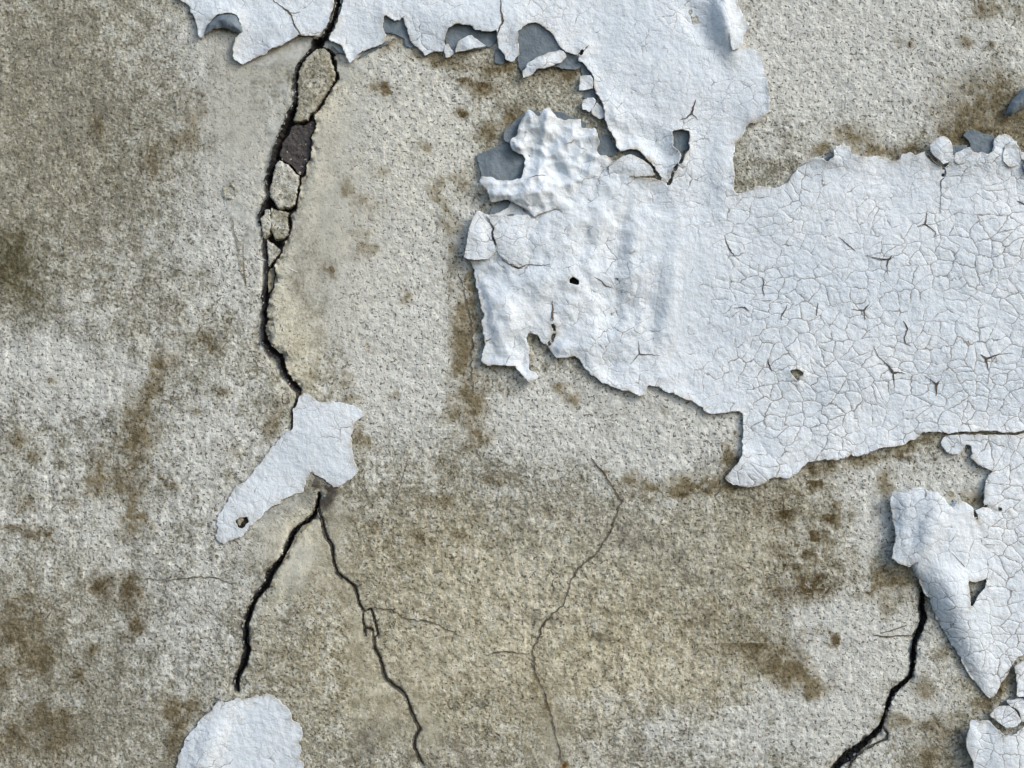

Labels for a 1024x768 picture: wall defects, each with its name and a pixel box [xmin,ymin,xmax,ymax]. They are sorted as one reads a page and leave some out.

crack [257,0,342,429]
peeling [180,0,1024,487]
crack [839,237,893,273]
crack [918,151,947,235]
crack [874,348,939,395]
crack [981,353,1008,380]
peeling [215,393,364,545]
crack [943,429,1022,437]
peeling [176,693,304,768]
crack [145,492,461,764]
crack [833,588,927,768]
peeling [966,661,1024,768]